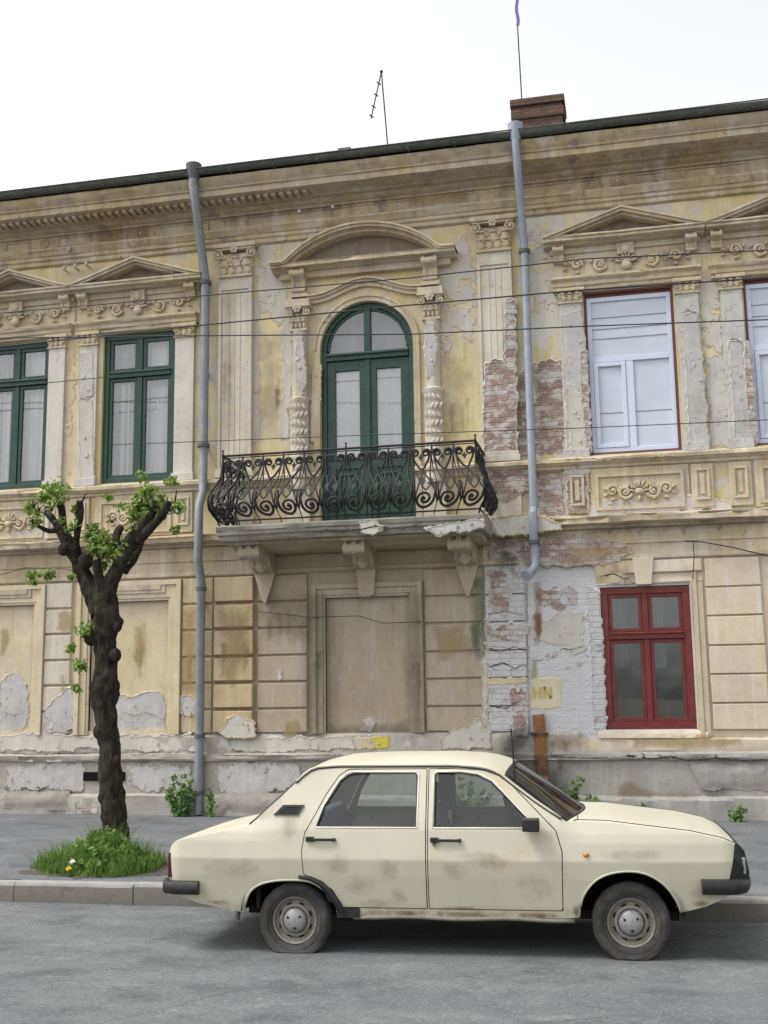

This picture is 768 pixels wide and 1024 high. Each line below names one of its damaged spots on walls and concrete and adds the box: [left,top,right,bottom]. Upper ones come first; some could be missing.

peeling [253,243,322,443]
flaking render [681,275,758,448]
flaking render [423,229,733,751]
flaking render [0,671,99,815]
flaking render [116,690,195,793]
flaking render [212,714,389,794]